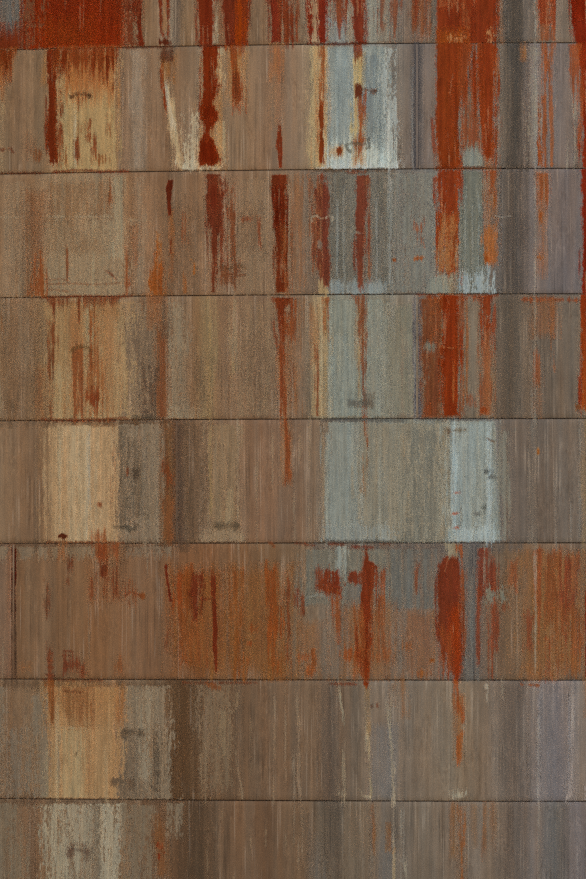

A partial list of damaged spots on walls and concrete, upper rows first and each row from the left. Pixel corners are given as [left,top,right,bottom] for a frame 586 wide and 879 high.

rust [0,0,144,165]
rust [31,250,130,419]
rust [198,0,261,292]
rust [271,126,296,484]
rust [269,0,366,163]
rust [309,174,331,329]
rust [377,0,500,276]
rust [420,295,493,416]
rust [522,0,586,410]
rust [316,549,391,689]
rust [430,543,517,765]
rust [526,547,586,678]